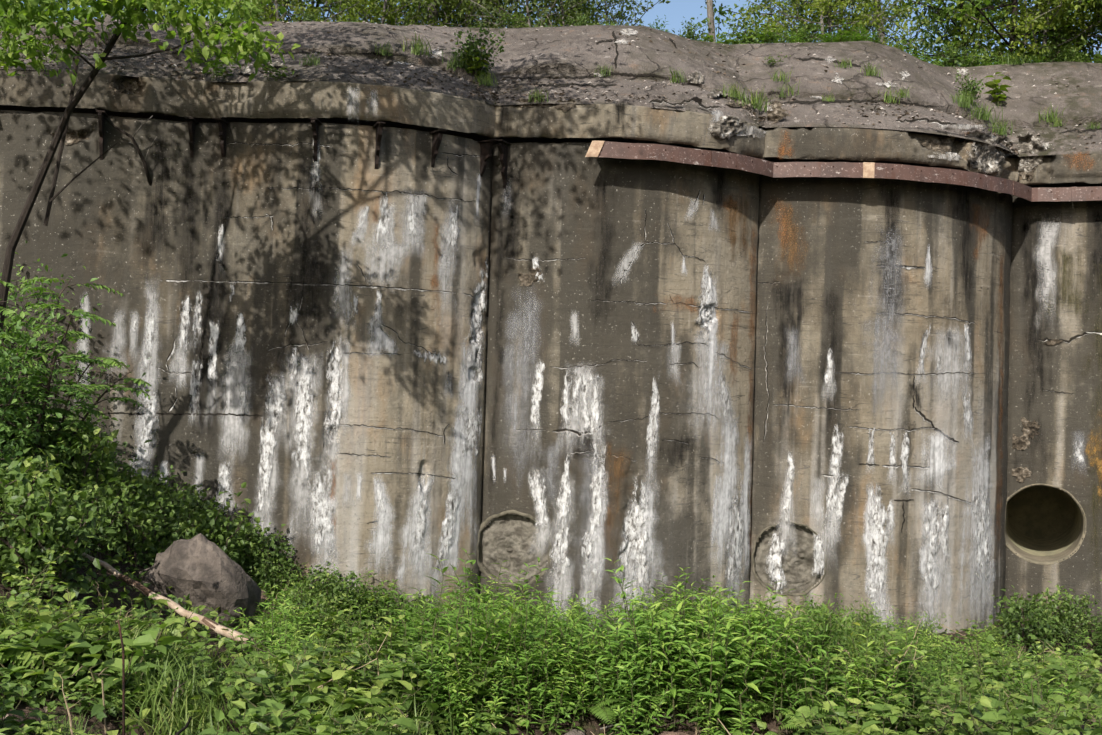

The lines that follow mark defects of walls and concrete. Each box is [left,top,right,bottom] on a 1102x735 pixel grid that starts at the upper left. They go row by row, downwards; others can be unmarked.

spalling [896,118,1049,182]
leakage [131,292,167,481]
leakage [171,173,247,448]
leakage [255,139,437,538]
leakage [434,176,520,582]
spalling [503,257,582,287]
leakage [528,372,660,620]
crack [551,207,975,443]
crack [822,463,972,532]
spalling [1012,466,1032,483]
spalling [1012,417,1039,450]
crack [1039,331,1102,346]